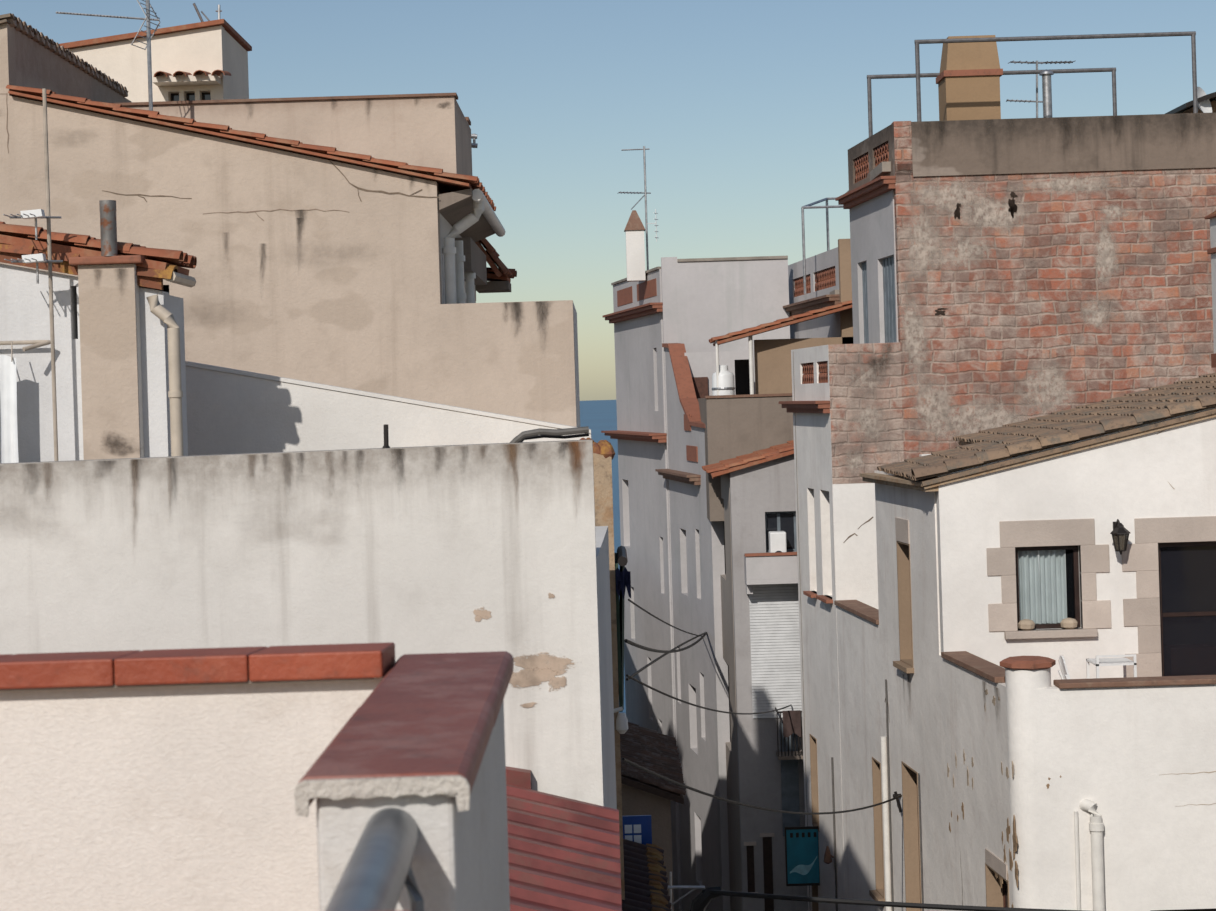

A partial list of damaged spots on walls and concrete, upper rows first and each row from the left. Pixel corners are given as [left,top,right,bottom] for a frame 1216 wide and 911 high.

crack [102,161,439,221]
peeling [473,607,491,622]
peeling [509,652,574,691]
peeling [947,749,974,789]
peeling [995,815,1018,888]